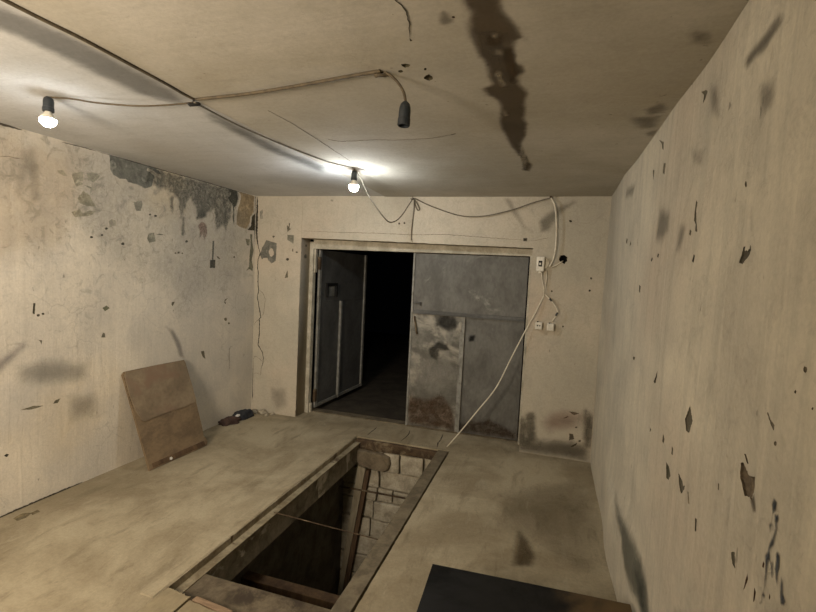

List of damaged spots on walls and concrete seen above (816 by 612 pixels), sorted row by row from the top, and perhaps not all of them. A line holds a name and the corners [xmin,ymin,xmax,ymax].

crack [395,0,411,37]
leakage [466,0,531,171]
spalling [739,246,751,264]
leakage [519,415,592,456]
spalling [685,407,693,432]
spalling [740,454,755,499]
leakage [765,500,785,604]